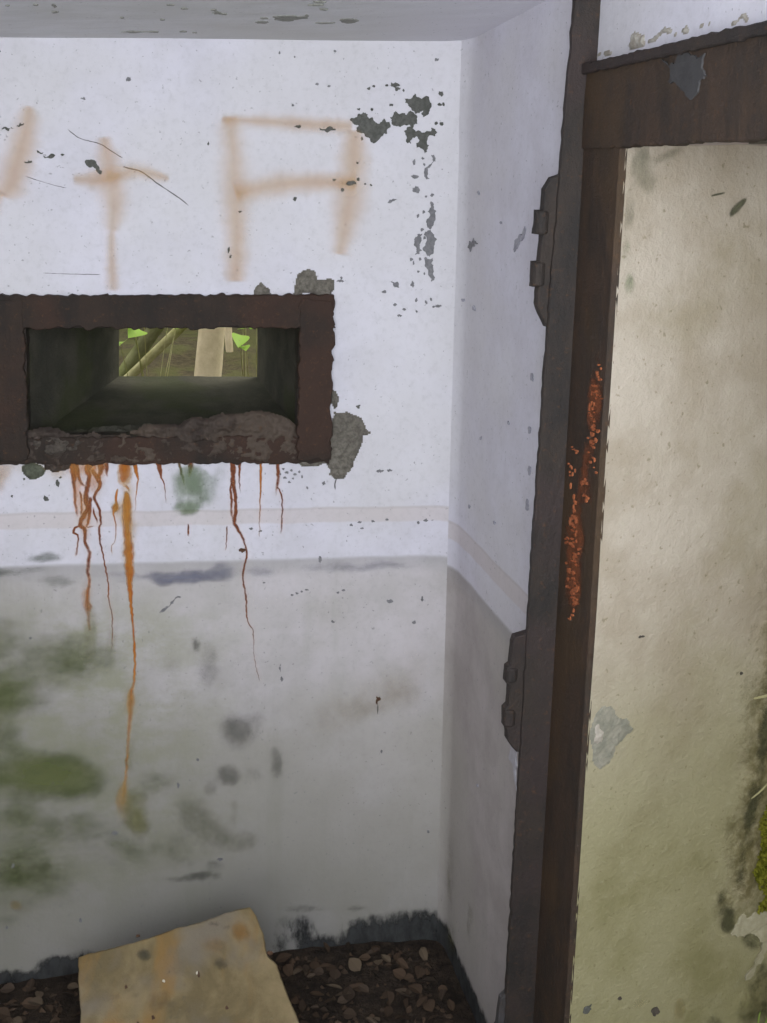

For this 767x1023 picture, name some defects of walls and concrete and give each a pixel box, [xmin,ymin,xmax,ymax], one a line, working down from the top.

peeling [255,0,359,24]
peeling [350,82,445,317]
spalling [279,390,371,489]
corrosion [564,364,603,620]
corrosion [70,463,139,735]
corrosion [226,463,254,639]
spalling [590,706,633,769]
leakage [0,953,89,984]
leakage [295,910,486,1023]